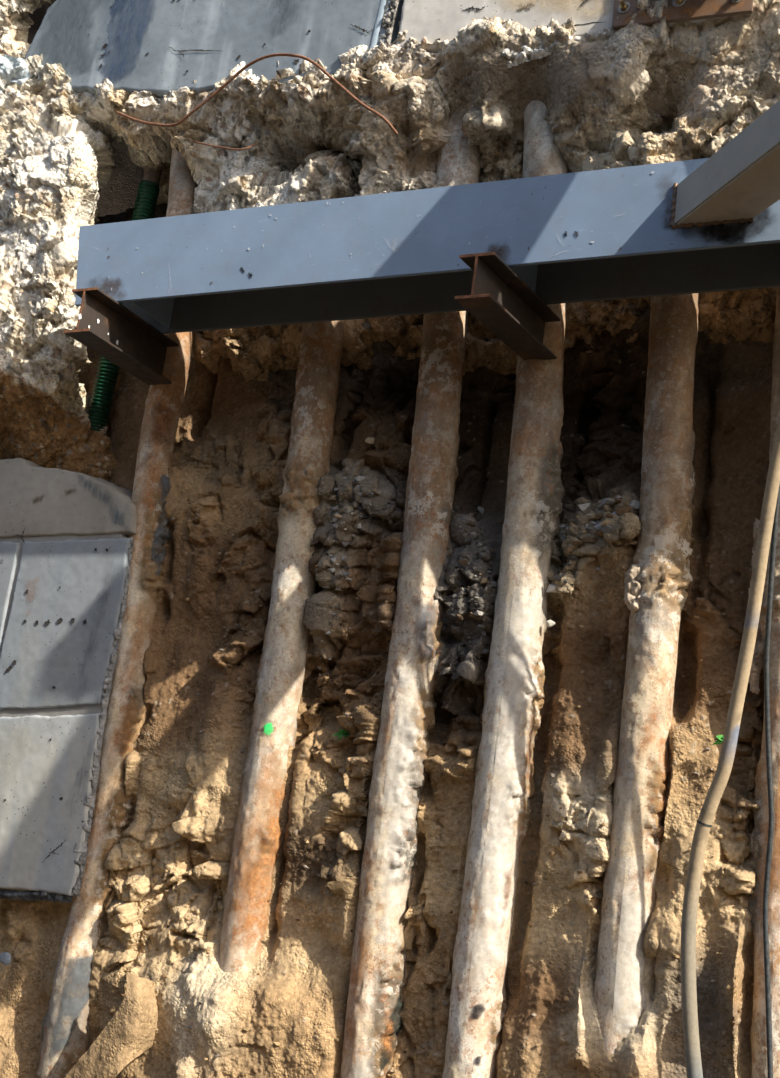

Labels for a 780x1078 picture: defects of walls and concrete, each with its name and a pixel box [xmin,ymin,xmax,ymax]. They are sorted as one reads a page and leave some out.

water stain [39,0,152,80]
spalling [0,0,780,481]
corrosion [233,789,286,942]